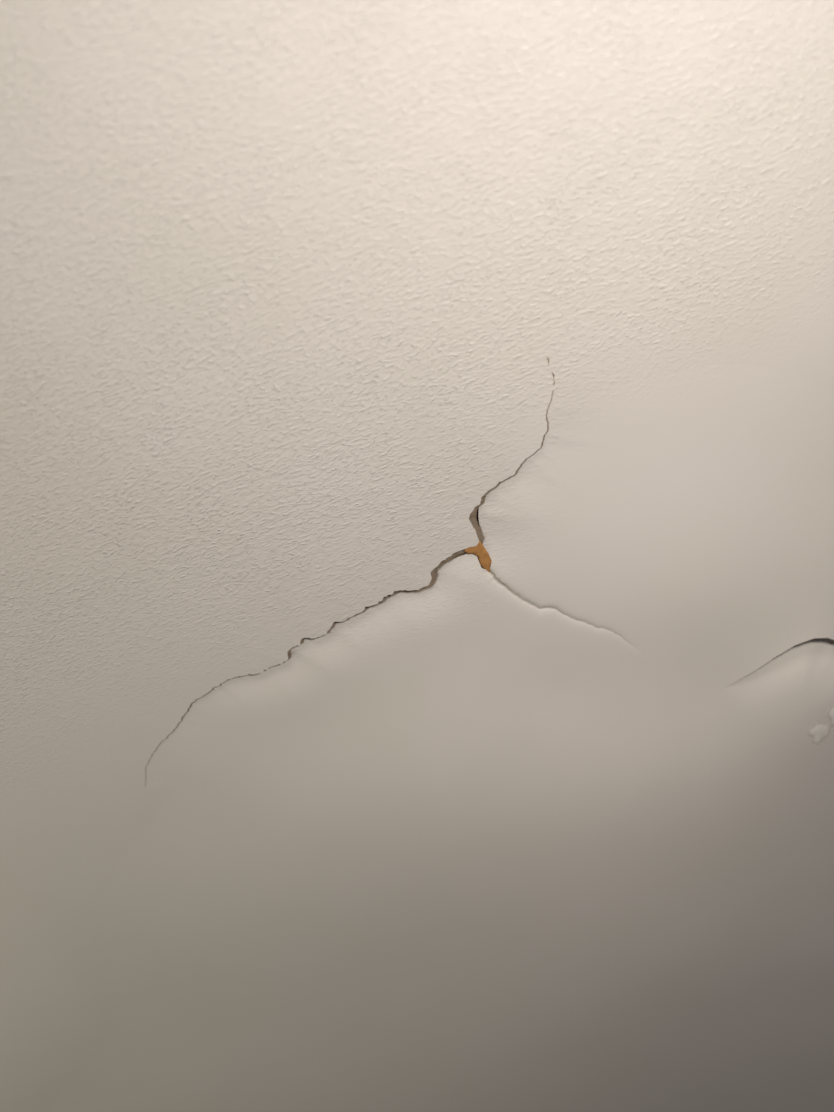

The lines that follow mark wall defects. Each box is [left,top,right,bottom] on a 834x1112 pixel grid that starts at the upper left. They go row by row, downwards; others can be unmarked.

crack [283,357,611,663]
crack [145,680,227,787]